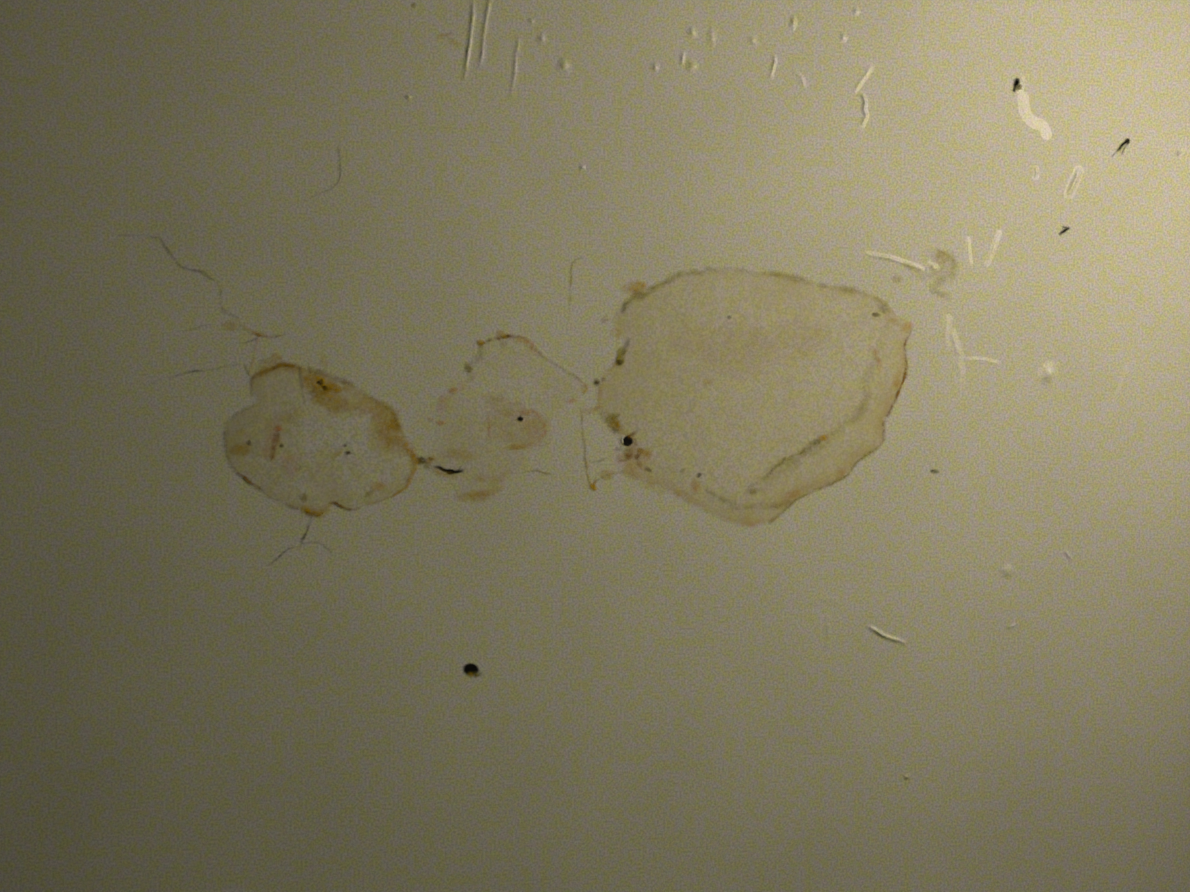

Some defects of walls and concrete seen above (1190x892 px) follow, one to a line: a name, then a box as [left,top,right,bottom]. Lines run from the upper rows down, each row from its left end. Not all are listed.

water stain [226,267,913,527]